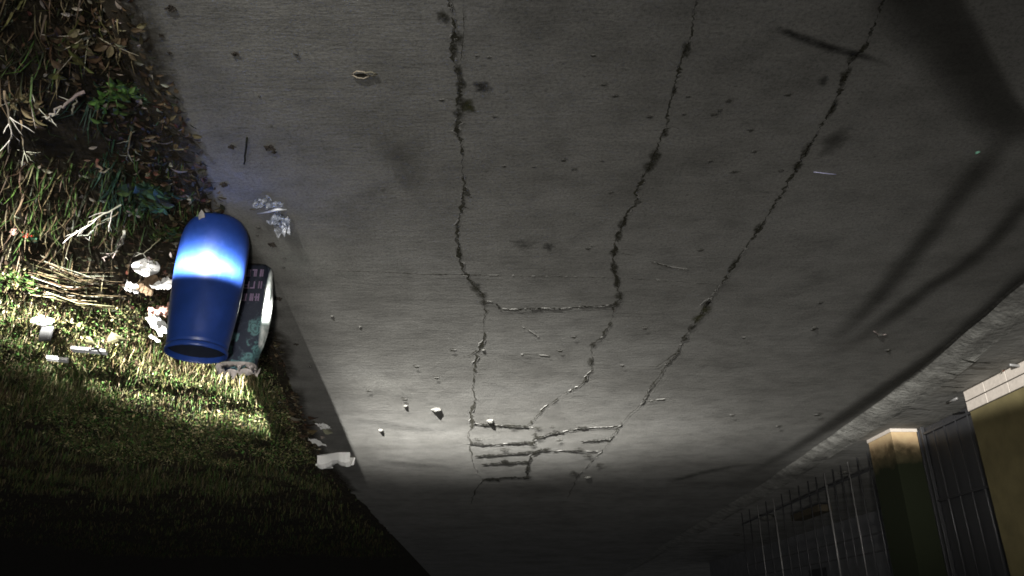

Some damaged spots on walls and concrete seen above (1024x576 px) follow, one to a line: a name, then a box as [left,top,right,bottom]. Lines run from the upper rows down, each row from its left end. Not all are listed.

crack [320,0,886,503]